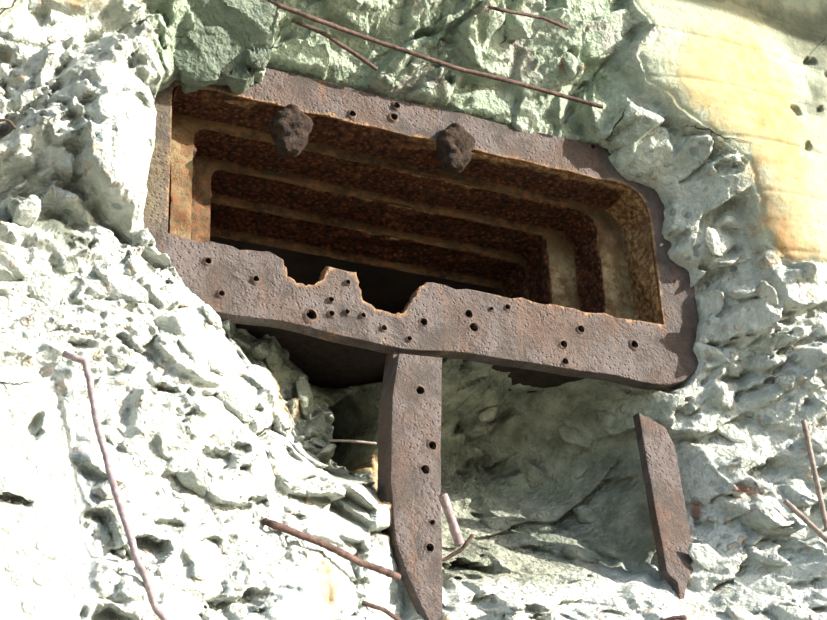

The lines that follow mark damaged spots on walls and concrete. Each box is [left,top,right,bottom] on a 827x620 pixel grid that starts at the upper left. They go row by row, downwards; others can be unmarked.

spalling [0,0,658,620]
spalling [438,64,827,620]
rust [681,35,811,258]